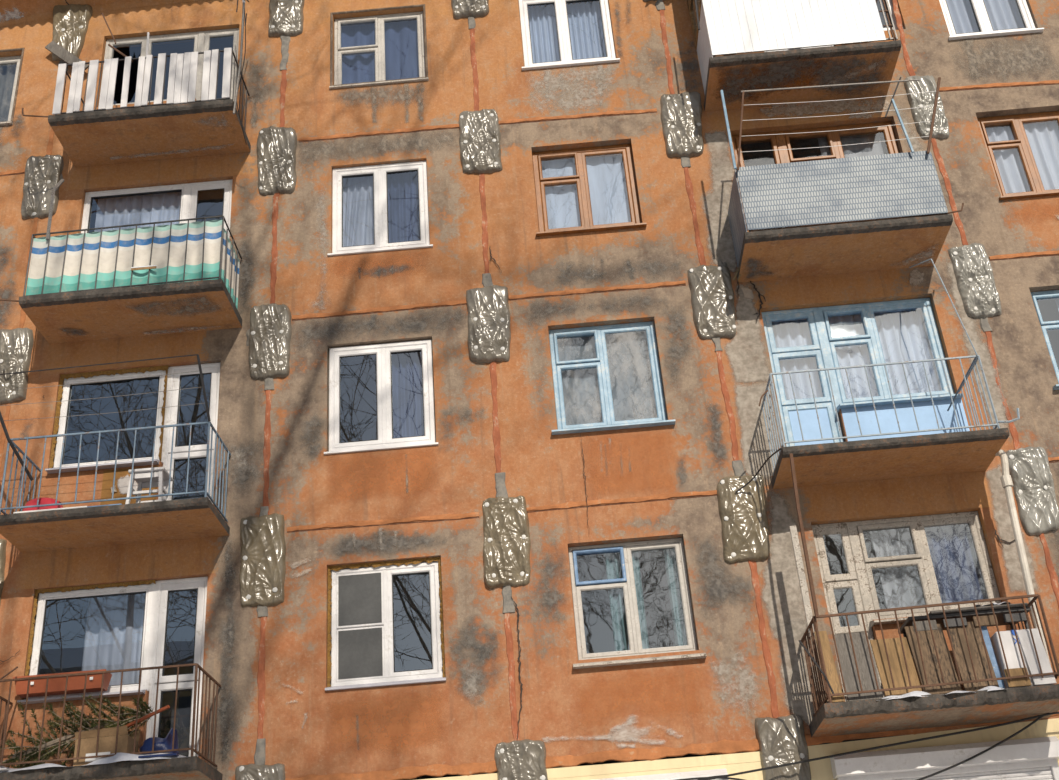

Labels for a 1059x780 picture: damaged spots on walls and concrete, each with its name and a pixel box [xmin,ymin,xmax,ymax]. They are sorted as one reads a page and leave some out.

damp [339,84,423,123]
crack [511,597,523,739]
peeling [590,718,681,748]
flaking render [762,495,818,724]